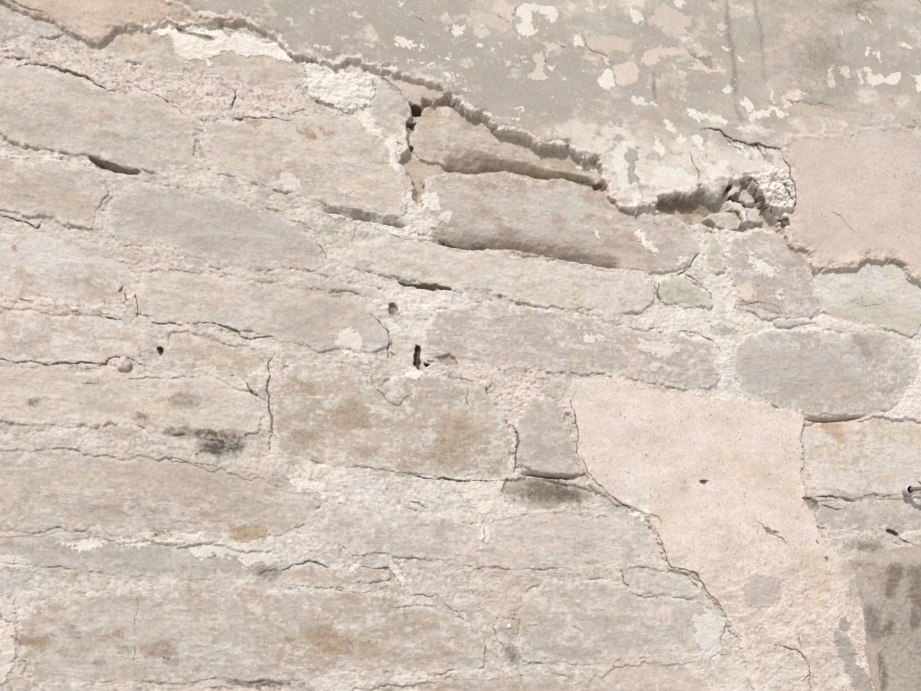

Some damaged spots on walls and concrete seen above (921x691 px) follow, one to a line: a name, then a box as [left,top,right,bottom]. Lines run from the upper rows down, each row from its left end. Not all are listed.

spalling [31,13,184,47]
peeling [444,0,559,81]
peeling [273,31,751,208]
peeling [573,0,735,107]
peeling [728,142,768,160]
crack [701,128,796,216]
peeling [685,83,837,134]
peeling [827,47,921,92]
crack [0,357,179,384]
crack [100,286,276,451]
crack [571,406,628,506]
crack [652,515,739,635]